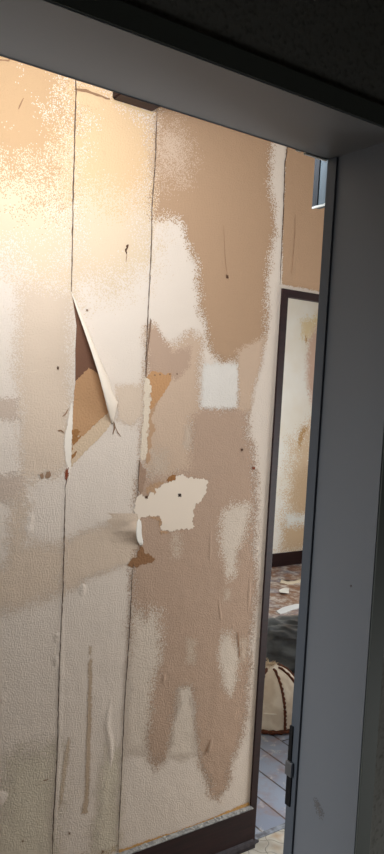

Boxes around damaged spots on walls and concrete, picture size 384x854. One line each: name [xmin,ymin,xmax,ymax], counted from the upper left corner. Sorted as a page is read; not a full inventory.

peeling [64,292,118,479]
peeling [128,371,208,568]